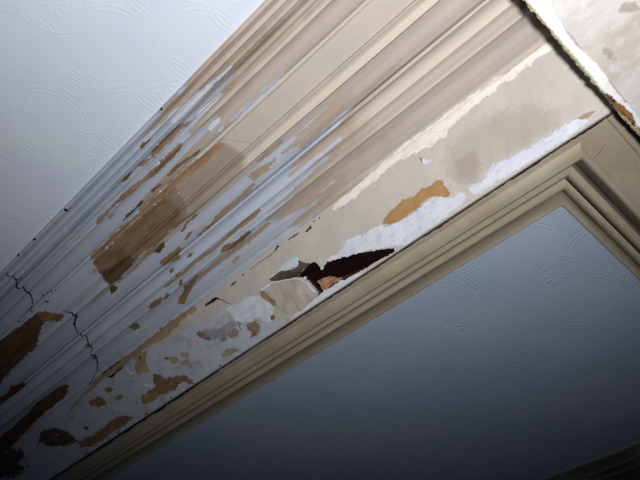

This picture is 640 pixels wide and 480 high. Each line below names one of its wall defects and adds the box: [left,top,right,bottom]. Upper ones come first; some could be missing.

peeling [523,0,640,136]
crack [7,273,56,322]
peeling [0,311,64,385]
peeling [70,65,289,449]
crack [50,113,613,480]
peeling [225,111,595,324]
peeling [0,382,69,456]